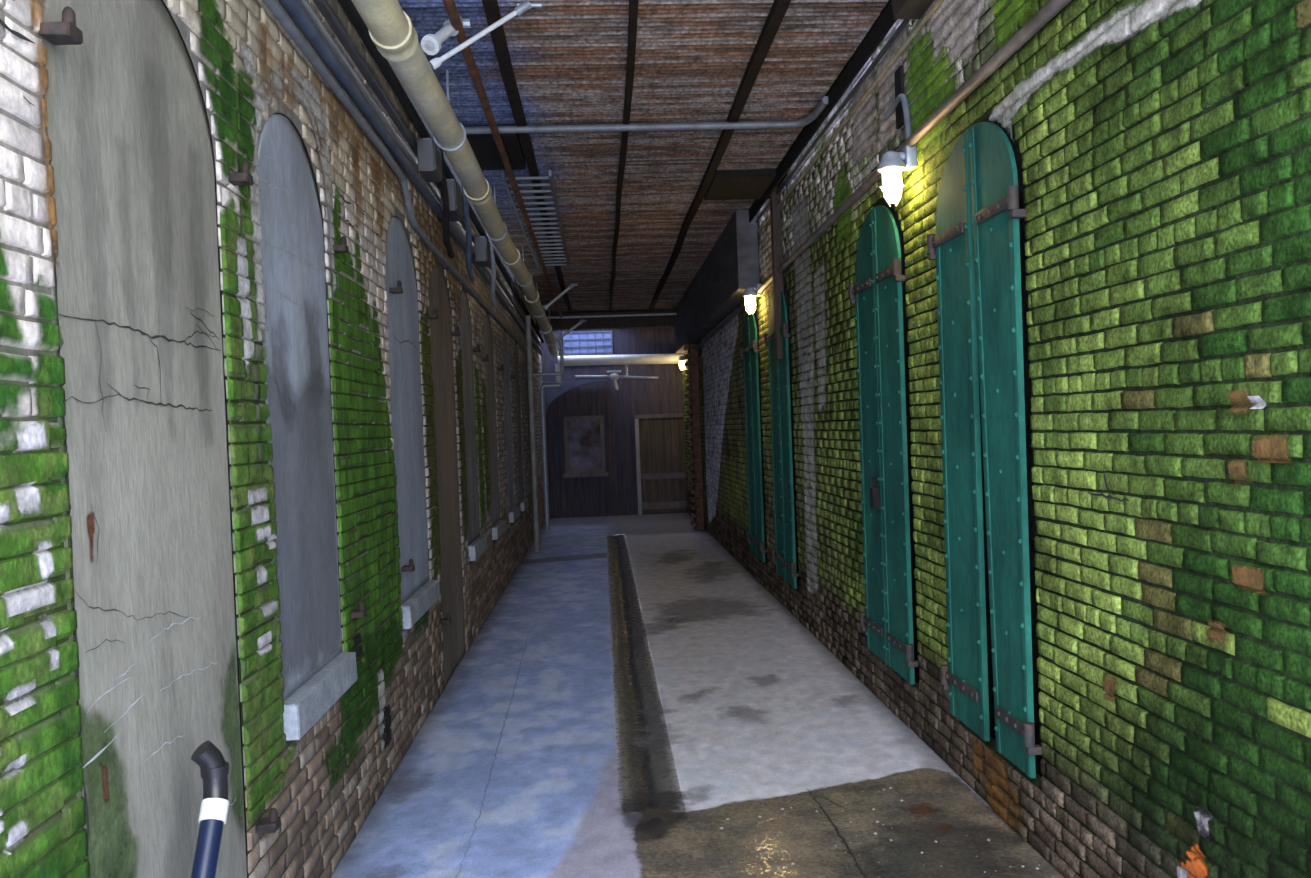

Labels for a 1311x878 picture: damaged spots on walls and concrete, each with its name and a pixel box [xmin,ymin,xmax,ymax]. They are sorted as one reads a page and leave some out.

peeling [17,423,47,450]
spalling [1228,435,1290,487]
peeling [0,482,40,523]
rust [87,513,95,562]
crack [53,227,220,878]
spalling [1232,565,1265,593]
peeling [0,541,59,671]
peeling [7,682,36,716]
water stain [59,615,138,878]
water stain [222,651,244,829]
peeling [0,811,28,855]
spalling [1194,808,1211,839]